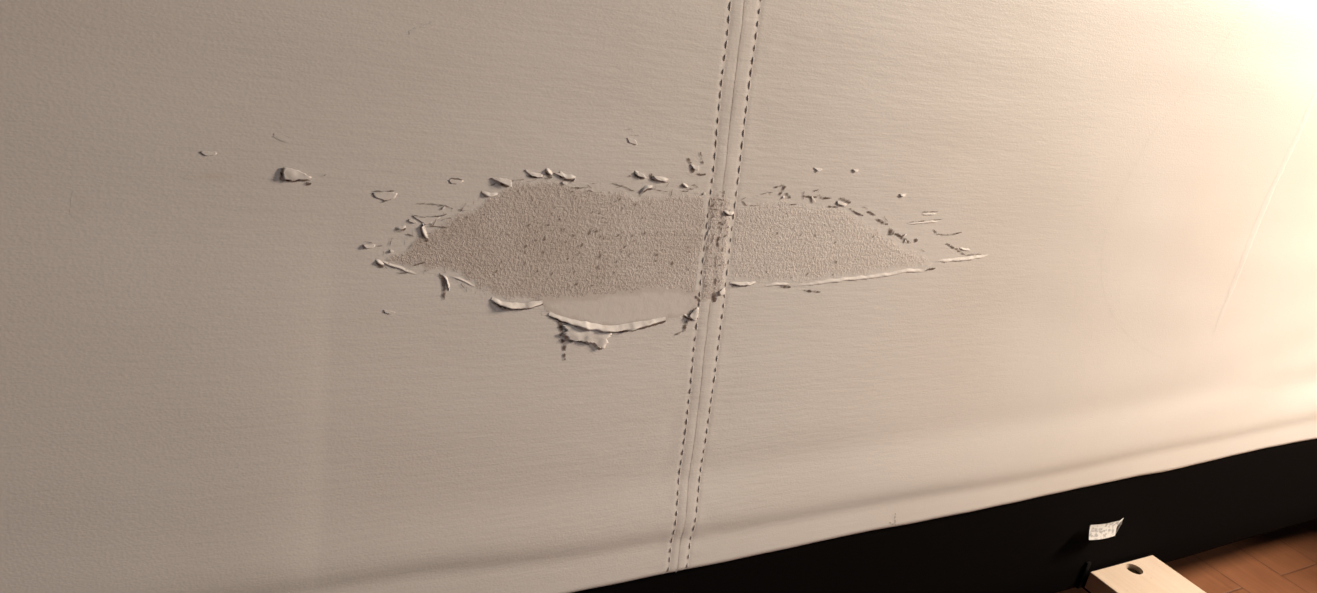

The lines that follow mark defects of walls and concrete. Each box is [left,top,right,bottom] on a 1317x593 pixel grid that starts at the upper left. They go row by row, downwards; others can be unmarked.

peeling [363,168,721,335]